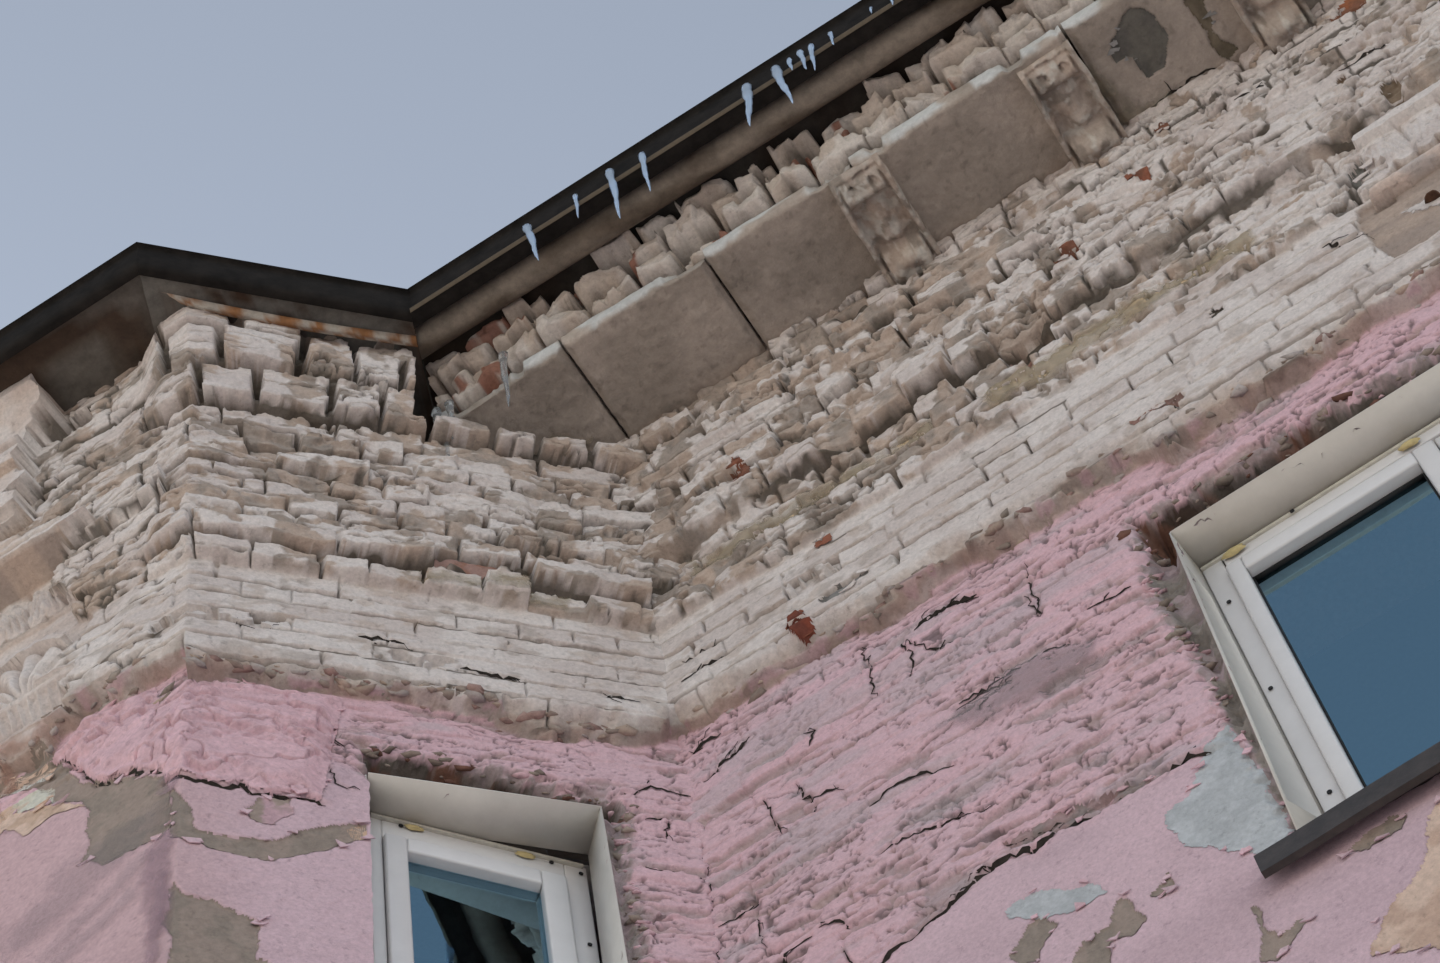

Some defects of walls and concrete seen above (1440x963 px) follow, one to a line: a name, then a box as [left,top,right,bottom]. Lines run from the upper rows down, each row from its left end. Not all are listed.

flaking render [1107,8,1169,78]
crack [358,635,412,651]
crack [460,667,520,682]
crack [681,639,725,682]
flaking render [785,560,944,646]
crack [861,594,979,696]
crack [957,564,1070,710]
peeling [1116,511,1296,855]
crack [624,727,1211,963]
flaking render [161,881,271,963]
peeling [1005,879,1147,963]
flaking render [1250,905,1316,962]